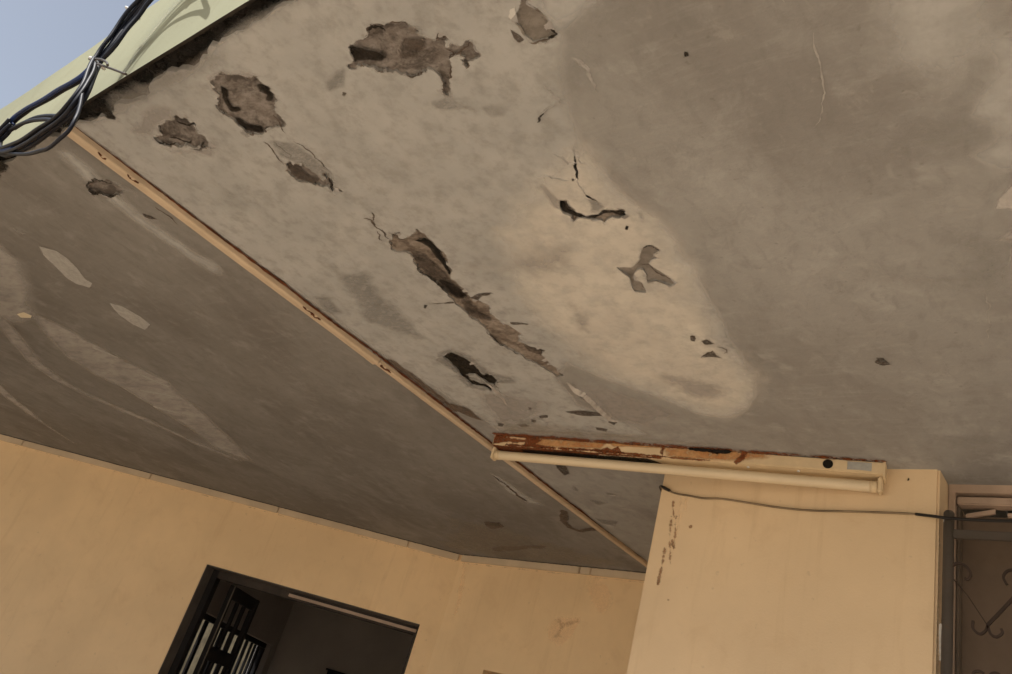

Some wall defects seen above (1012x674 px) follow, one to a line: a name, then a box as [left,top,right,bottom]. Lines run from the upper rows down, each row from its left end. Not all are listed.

peeling [508,0,557,44]
spalling [55,0,292,133]
flaking render [348,21,481,109]
flaking render [135,110,216,154]
flaking render [210,71,341,193]
flaking render [86,178,123,198]
flaking render [534,145,629,230]
corrosion [76,127,798,537]
flaking render [364,213,563,376]
peeling [619,245,677,291]
water stain [387,360,481,420]
flaking render [438,351,510,405]